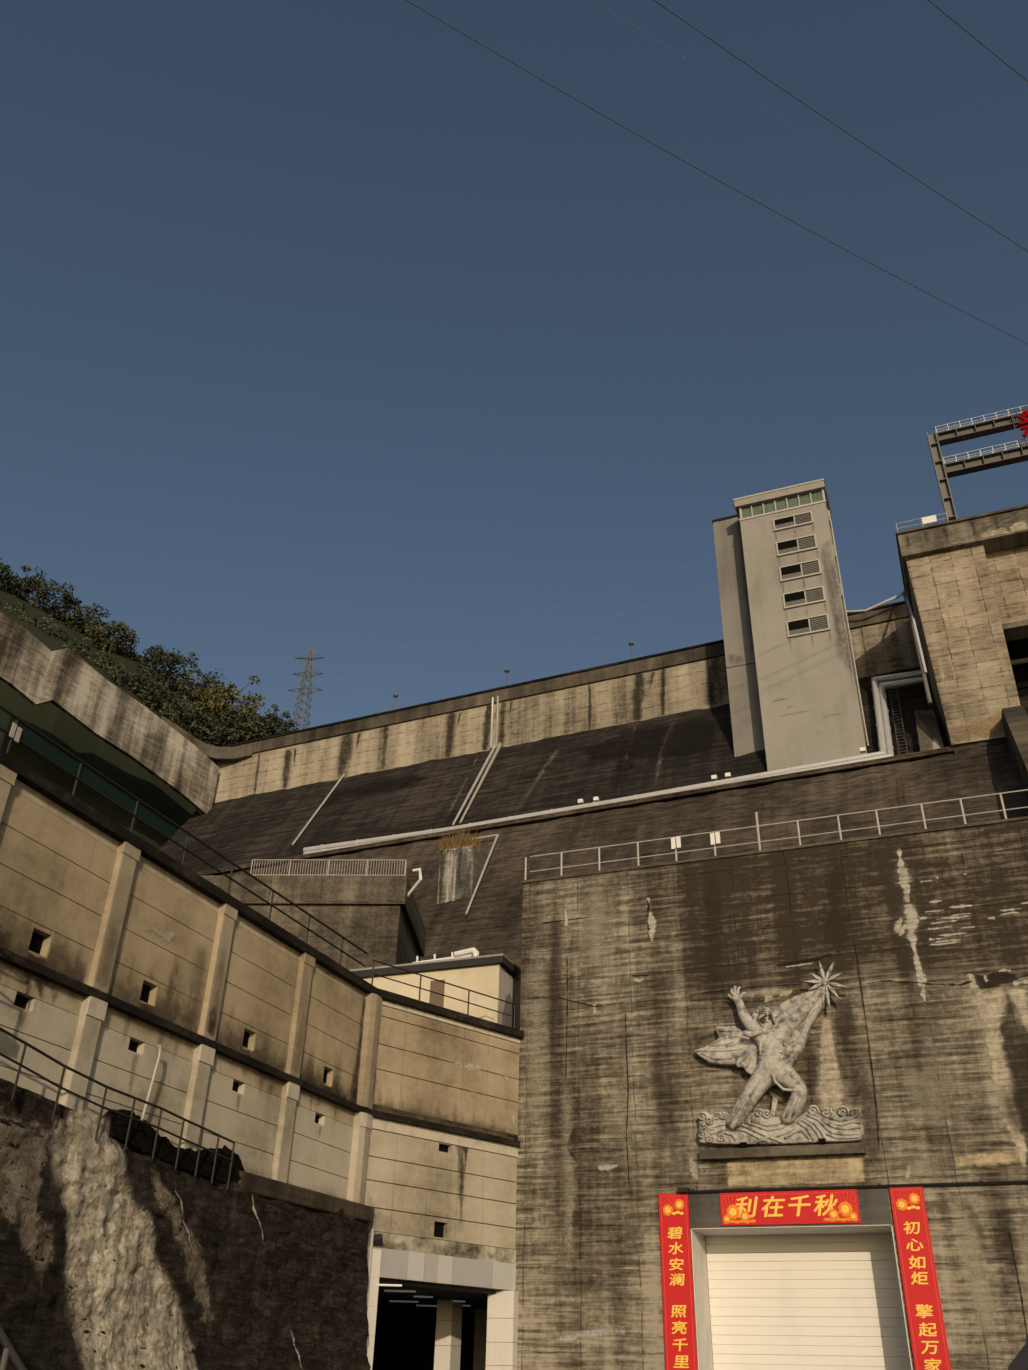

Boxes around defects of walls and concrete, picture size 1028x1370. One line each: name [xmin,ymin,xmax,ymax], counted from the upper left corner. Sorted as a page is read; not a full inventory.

efflorescence [894,851,927,1001]
spalling [967,969,1028,989]
leakage [972,989,1028,1166]
leakage [412,1115,506,1207]